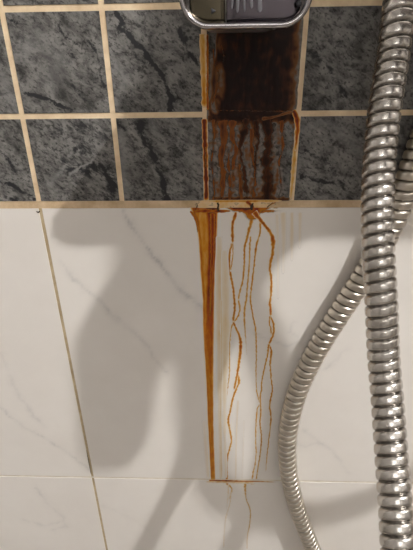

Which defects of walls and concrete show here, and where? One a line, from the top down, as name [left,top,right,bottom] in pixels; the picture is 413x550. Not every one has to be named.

corrosion [189,18,303,549]